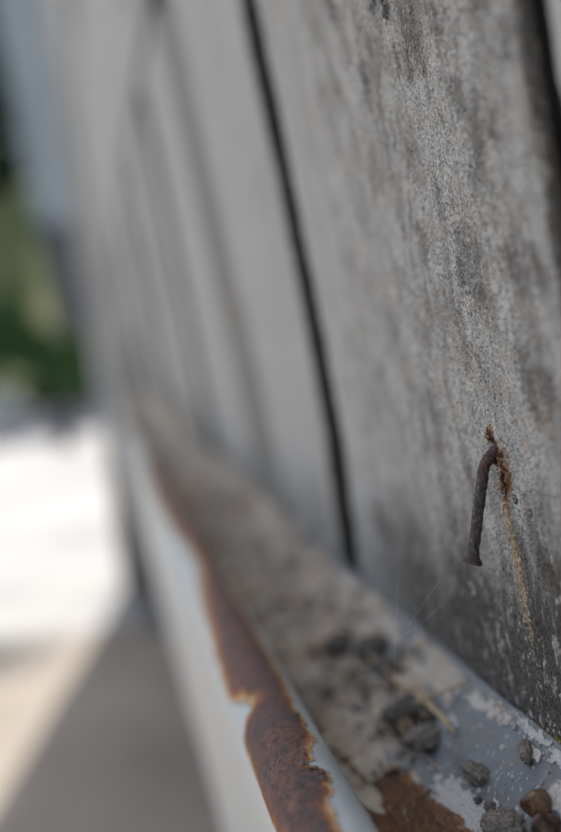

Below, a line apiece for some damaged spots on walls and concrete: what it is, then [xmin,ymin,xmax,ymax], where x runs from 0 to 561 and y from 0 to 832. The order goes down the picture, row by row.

corrosion [484,424,533,638]
corrosion [141,454,342,832]
corrosion [336,755,472,832]